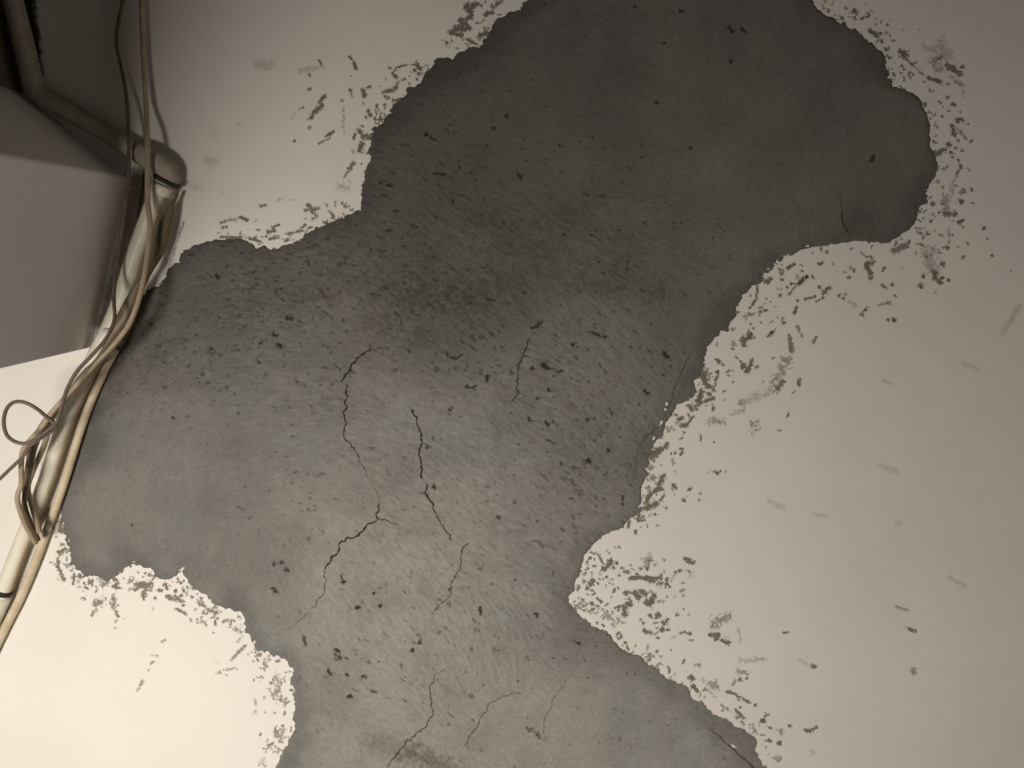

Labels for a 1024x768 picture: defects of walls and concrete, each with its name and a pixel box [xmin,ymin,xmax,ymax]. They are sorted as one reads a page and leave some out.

crack [339,349,371,477]
crack [507,332,535,402]
crack [316,504,396,604]
crack [410,407,469,614]
crack [386,682,434,768]